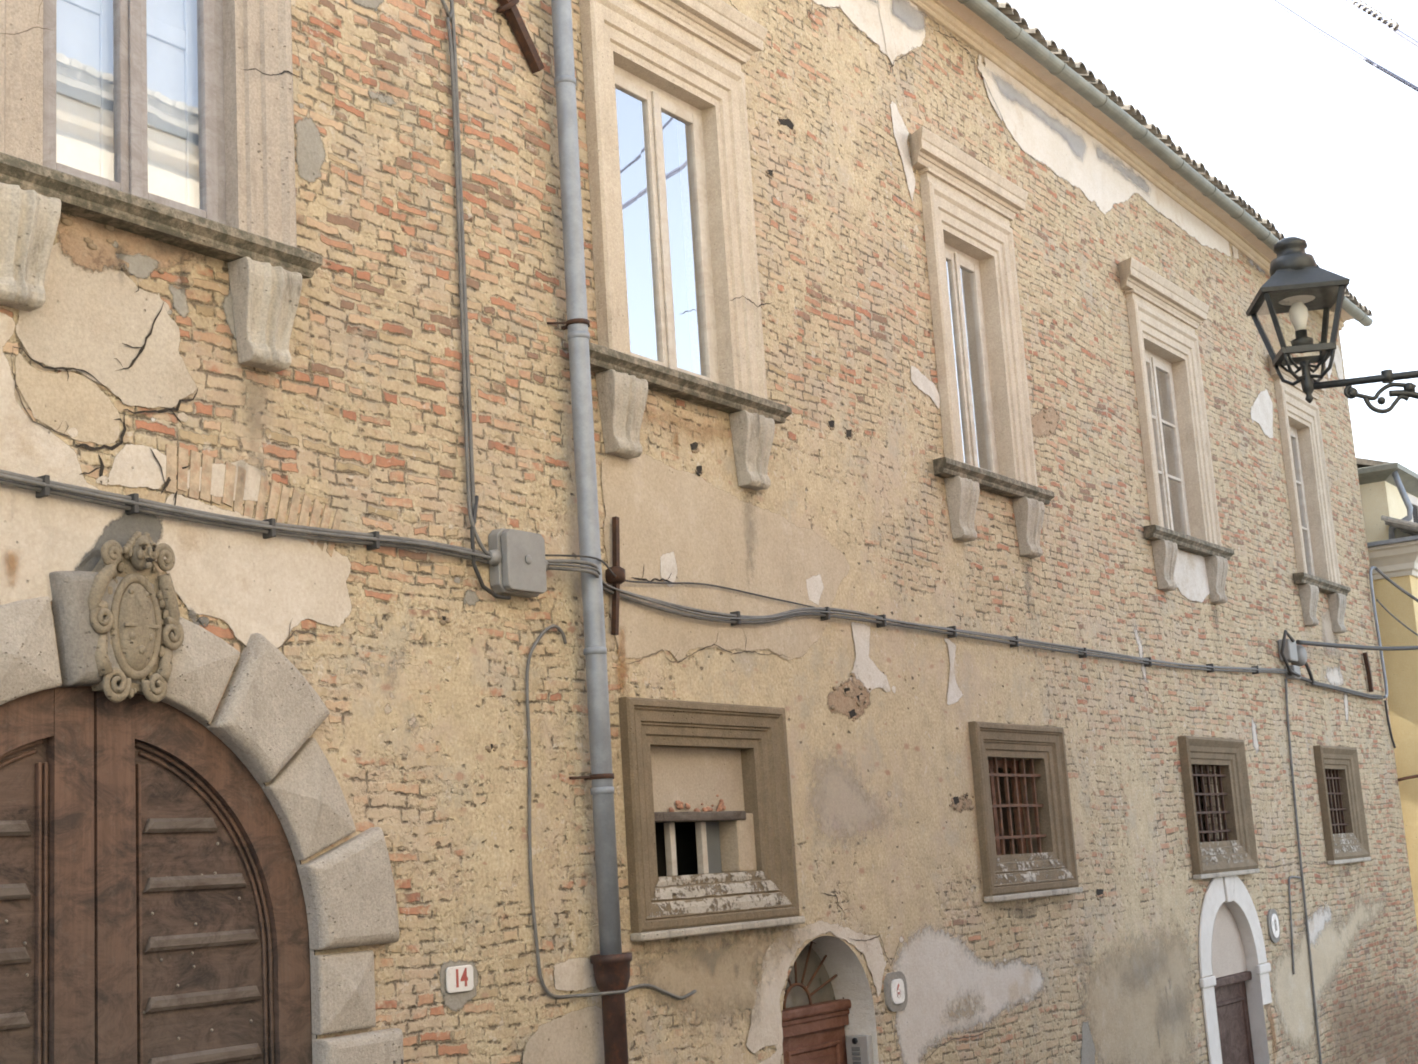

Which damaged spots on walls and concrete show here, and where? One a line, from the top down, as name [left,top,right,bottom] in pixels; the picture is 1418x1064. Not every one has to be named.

flaking render [813,0,928,65]
flaking render [978,55,1244,261]
crack [11,286,198,514]
flaking render [0,212,352,648]
crack [620,633,786,664]
flaking render [827,622,896,722]
flaking render [523,1005,604,1064]
flaking render [550,957,596,992]
flaking render [639,921,1044,1064]